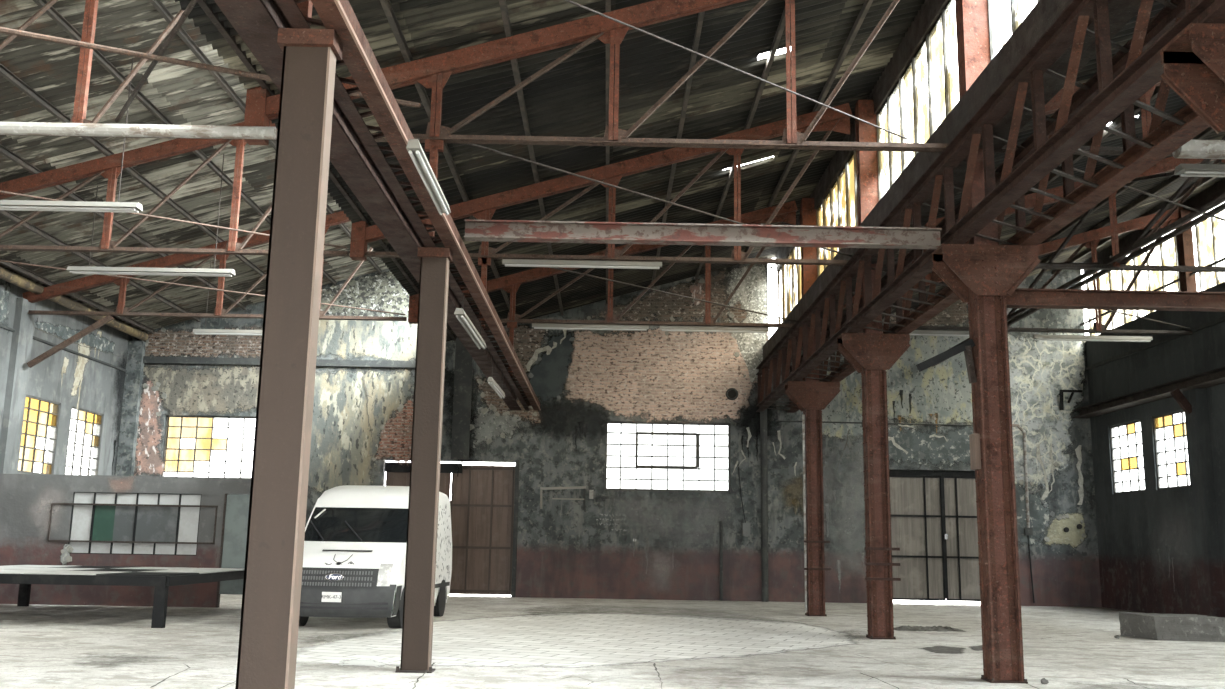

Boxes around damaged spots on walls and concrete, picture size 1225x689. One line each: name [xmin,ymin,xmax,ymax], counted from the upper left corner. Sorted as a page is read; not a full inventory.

peeling [133,324,263,476]
peeling [308,271,417,493]
flaking render [470,264,778,475]
leakage [823,459,865,582]
leakage [893,390,912,425]
peeling [1008,333,1087,548]